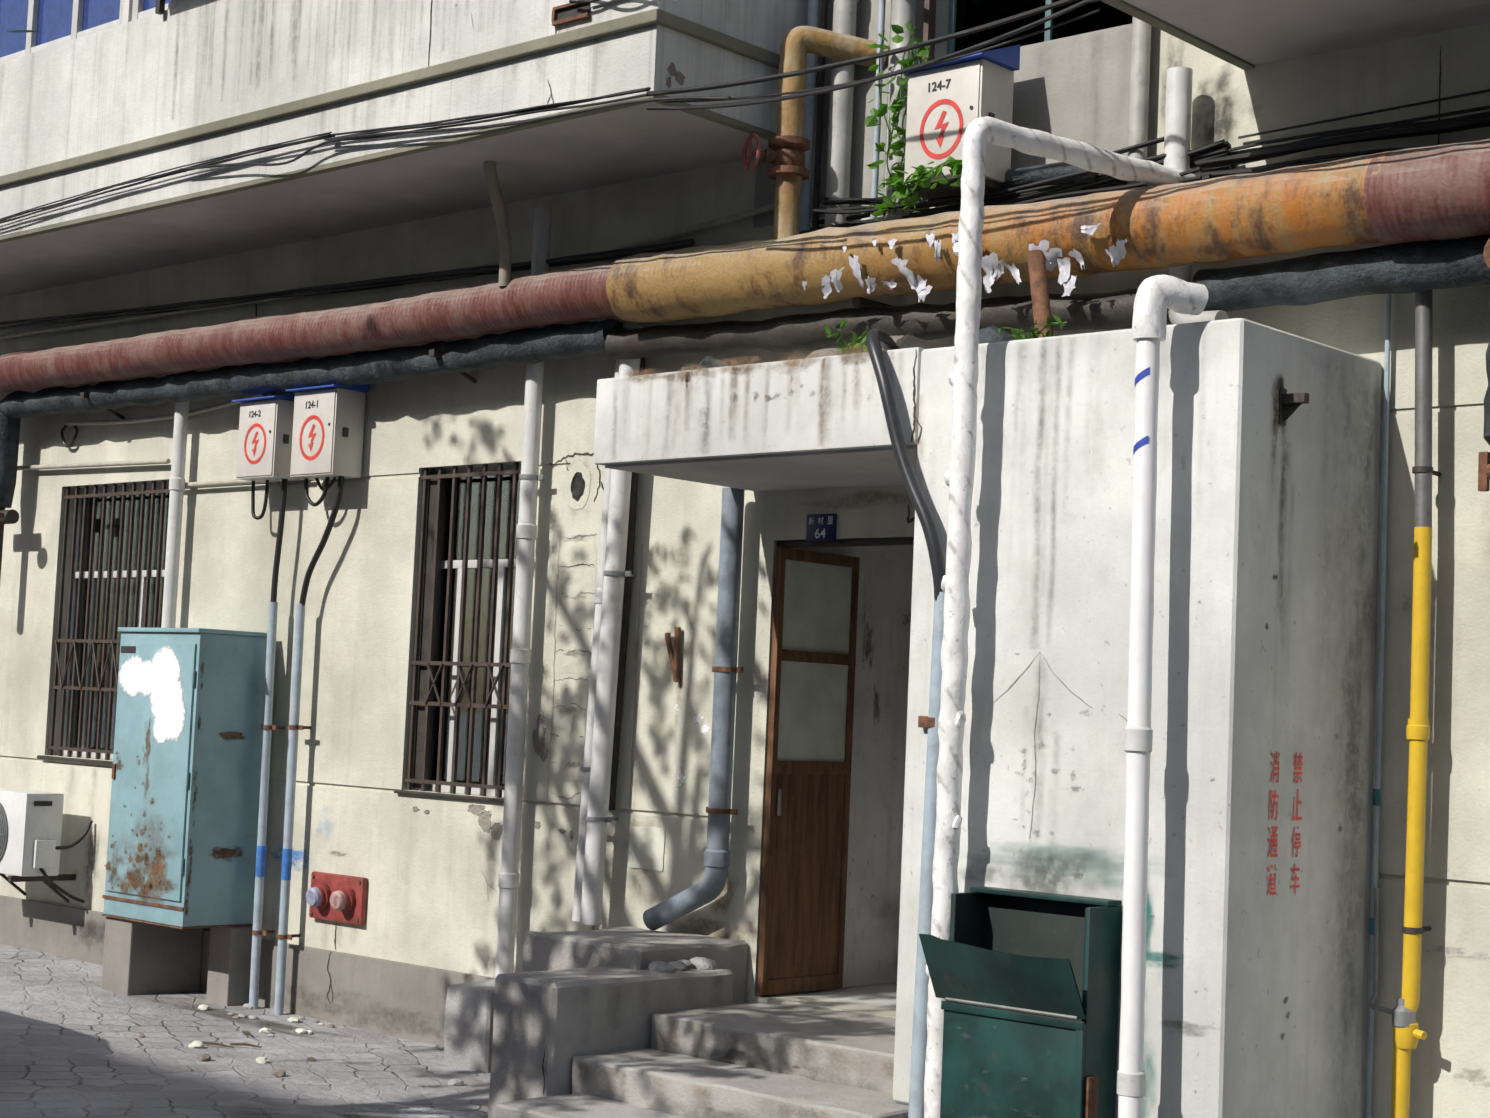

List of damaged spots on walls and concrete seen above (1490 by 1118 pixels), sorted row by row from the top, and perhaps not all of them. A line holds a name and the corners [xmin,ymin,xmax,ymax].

leakage [1207,80,1232,140]
crack [547,452,604,799]
spalling [532,712,549,762]
spalling [468,804,503,841]
crack [540,1048,548,1095]